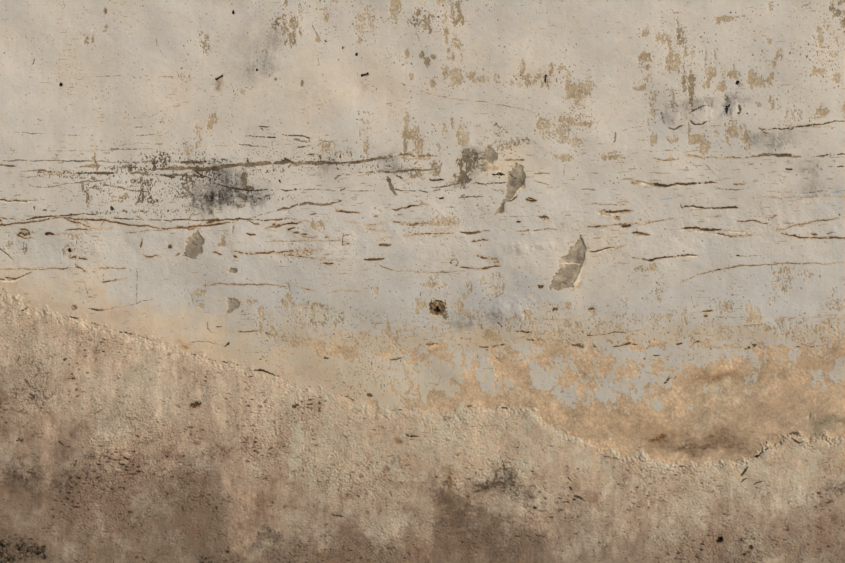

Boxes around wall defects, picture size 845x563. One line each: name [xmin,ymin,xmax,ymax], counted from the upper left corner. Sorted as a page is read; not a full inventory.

peeling [389,0,500,88]
peeling [641,21,783,111]
crack [69,255,158,326]
spalling [183,228,205,259]
crack [0,126,444,259]
spalling [223,112,537,215]
spalling [537,235,622,291]
crack [644,120,845,190]
crack [738,218,837,230]
peeling [226,254,845,464]
crack [740,432,803,485]
damp [0,540,46,563]